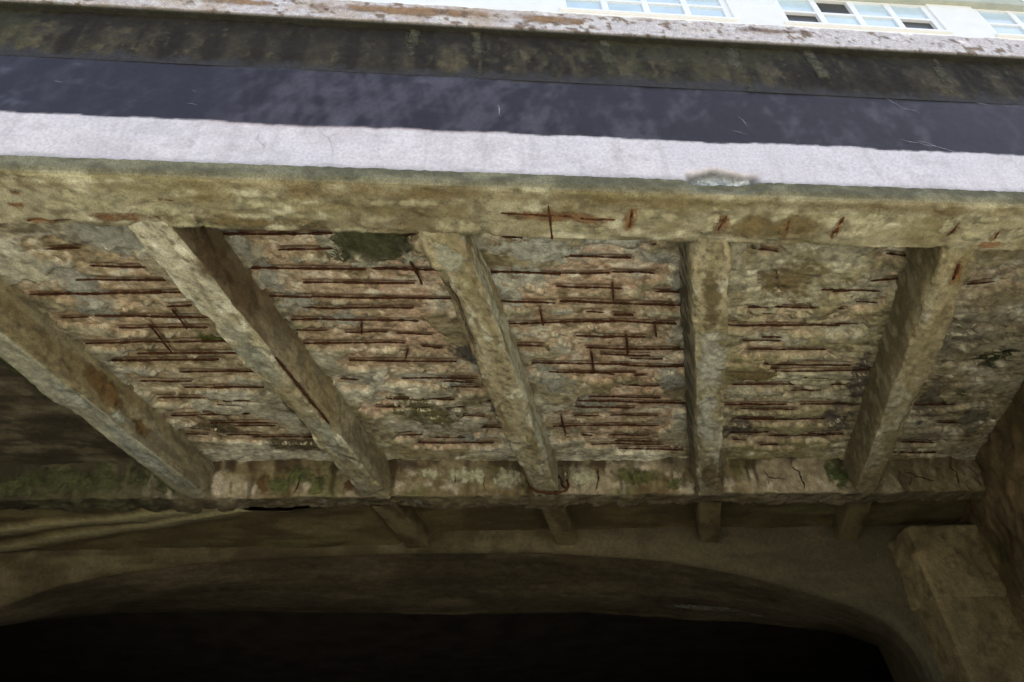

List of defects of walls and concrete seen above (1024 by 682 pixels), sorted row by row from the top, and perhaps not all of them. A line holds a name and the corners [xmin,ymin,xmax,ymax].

spalling [480,233,528,244]
spalling [746,221,791,258]
spalling [15,218,312,445]
spalling [223,229,505,450]
spalling [489,240,686,454]
spalling [723,247,907,460]
spalling [936,264,1024,386]
crack [763,467,805,488]
spalling [893,399,1000,456]